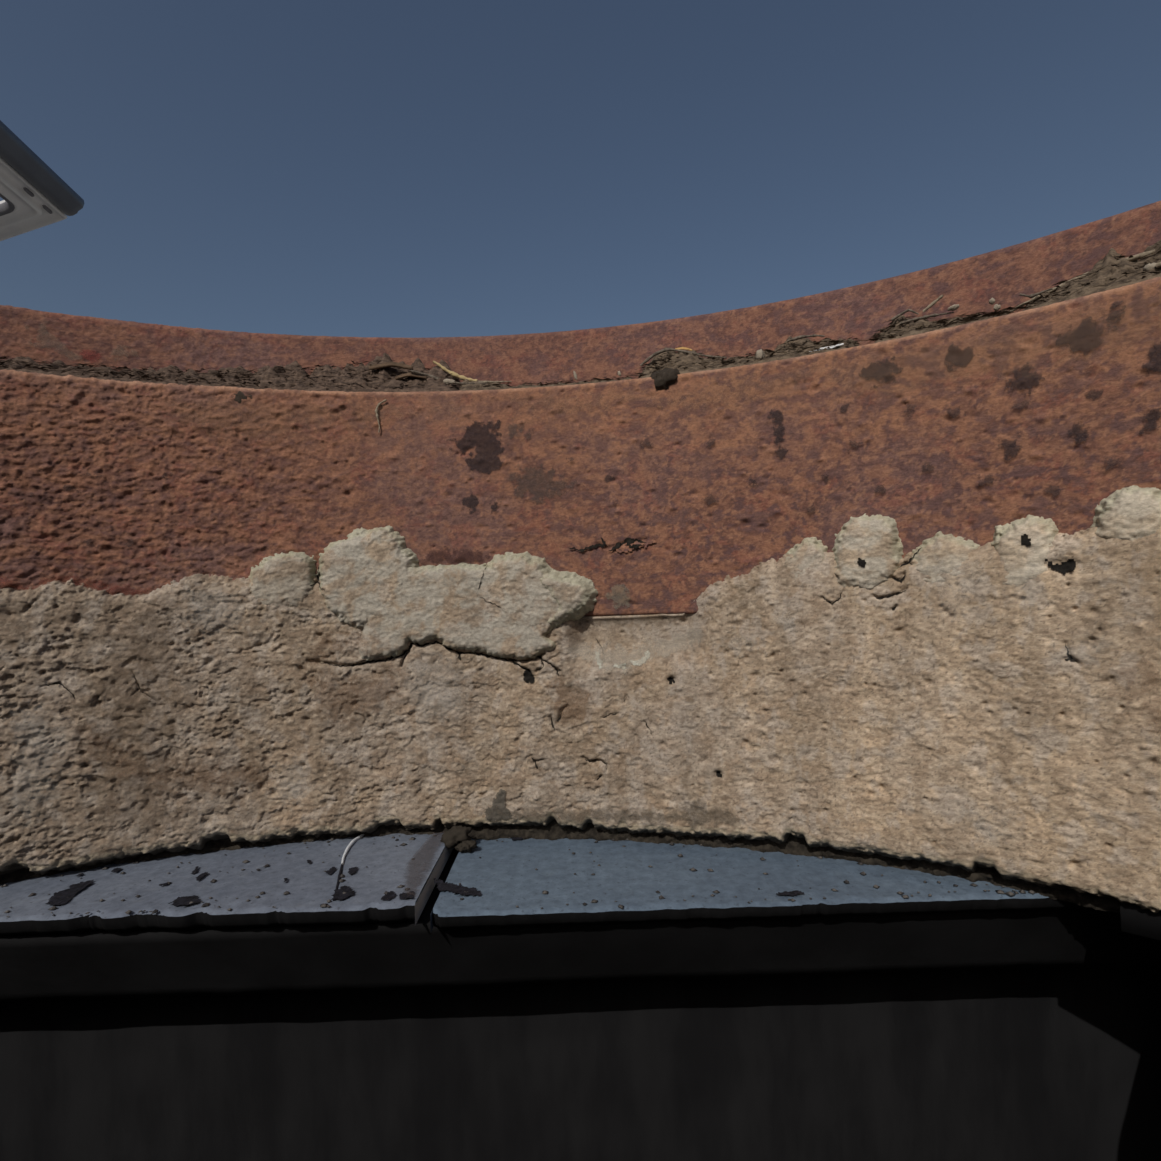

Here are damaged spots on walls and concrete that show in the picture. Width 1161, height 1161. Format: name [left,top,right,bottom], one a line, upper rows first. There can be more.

rust [1056,302,1126,355]
rust [860,356,903,388]
rust [945,344,973,371]
rust [1004,363,1045,408]
rust [451,420,504,474]
rust [768,410,788,459]
rust [998,439,1022,461]
rust [462,494,498,513]
rust [420,548,489,565]
rust [569,537,656,553]
peeling [358,562,598,661]
crack [315,641,559,675]